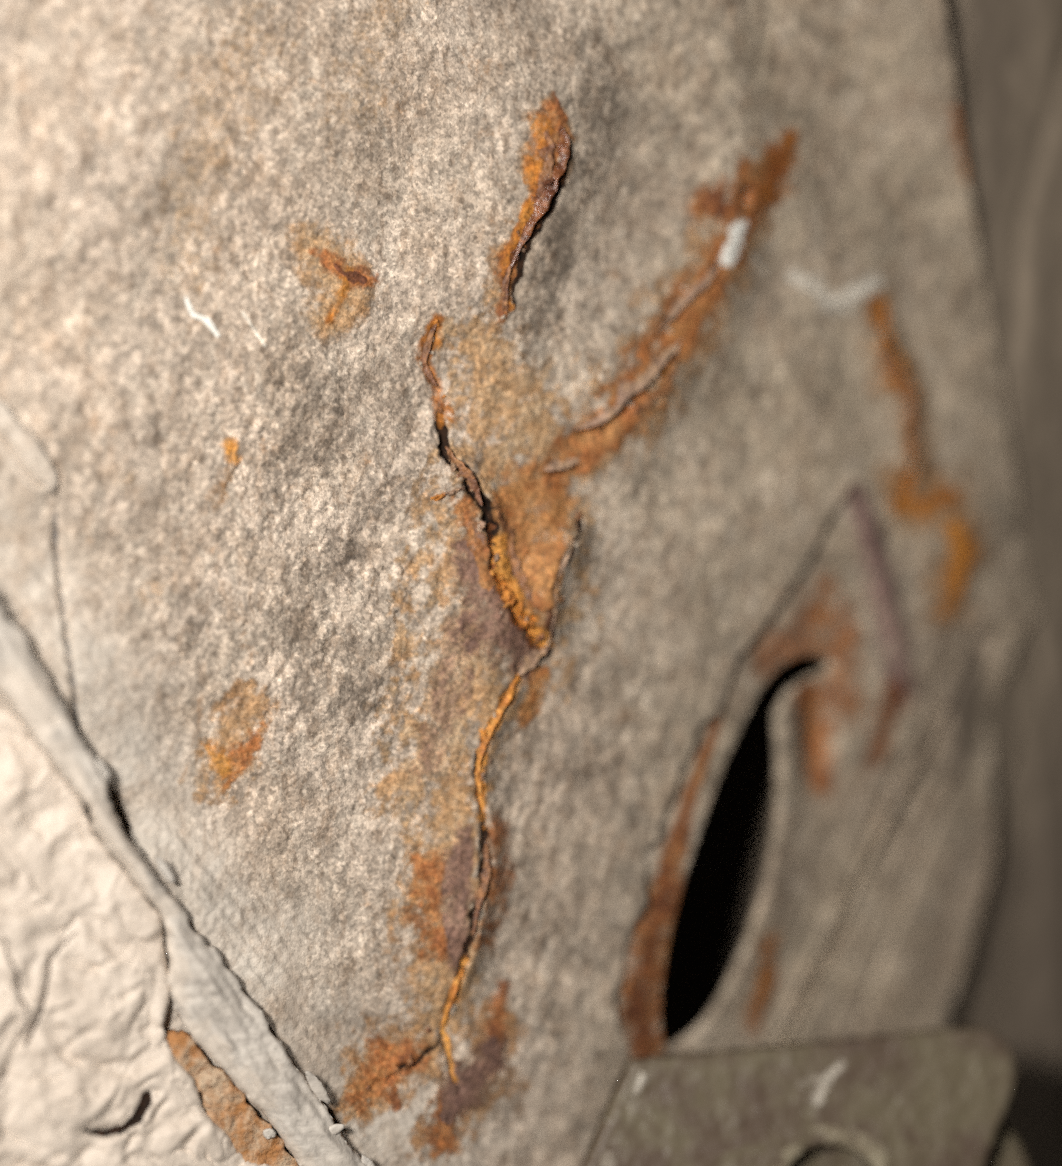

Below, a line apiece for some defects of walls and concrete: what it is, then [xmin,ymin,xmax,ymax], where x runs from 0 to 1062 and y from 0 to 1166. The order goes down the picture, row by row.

rust [291,223,377,342]
crack [485,92,573,332]
crack [543,157,786,484]
rust [690,130,797,219]
rust [193,678,279,804]
rust [330,302,607,1161]
crack [365,315,583,1091]
crack [613,483,855,1042]
rust [166,1029,299,1166]
rust [620,711,724,1057]
rust [746,933,779,1033]